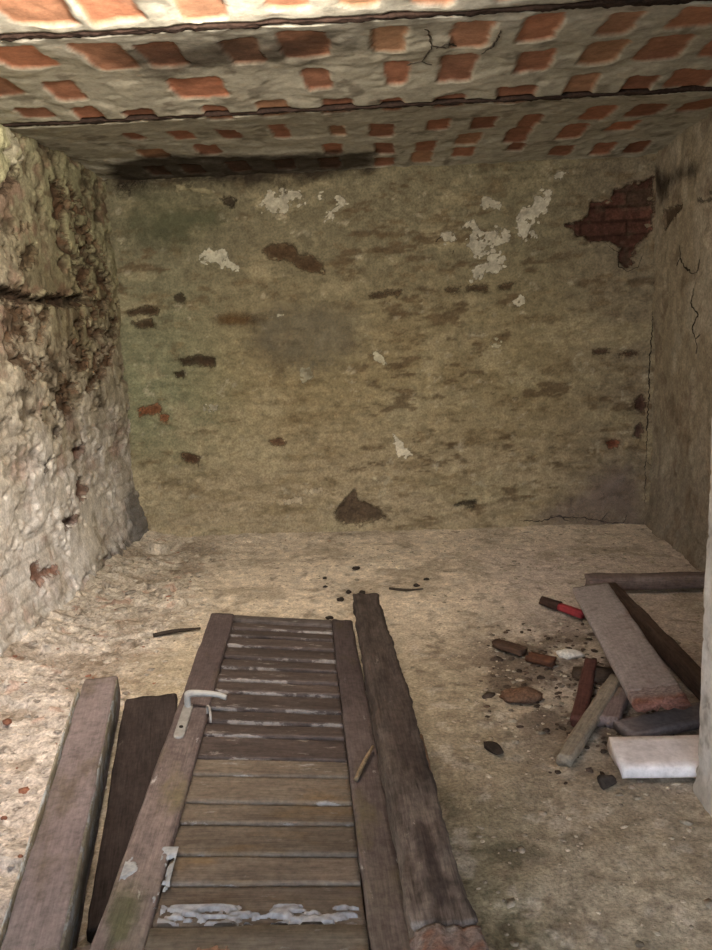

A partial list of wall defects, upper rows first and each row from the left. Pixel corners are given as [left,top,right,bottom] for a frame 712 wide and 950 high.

spalling [0,167,20,198]
spalling [564,176,683,268]
spalling [0,176,160,439]